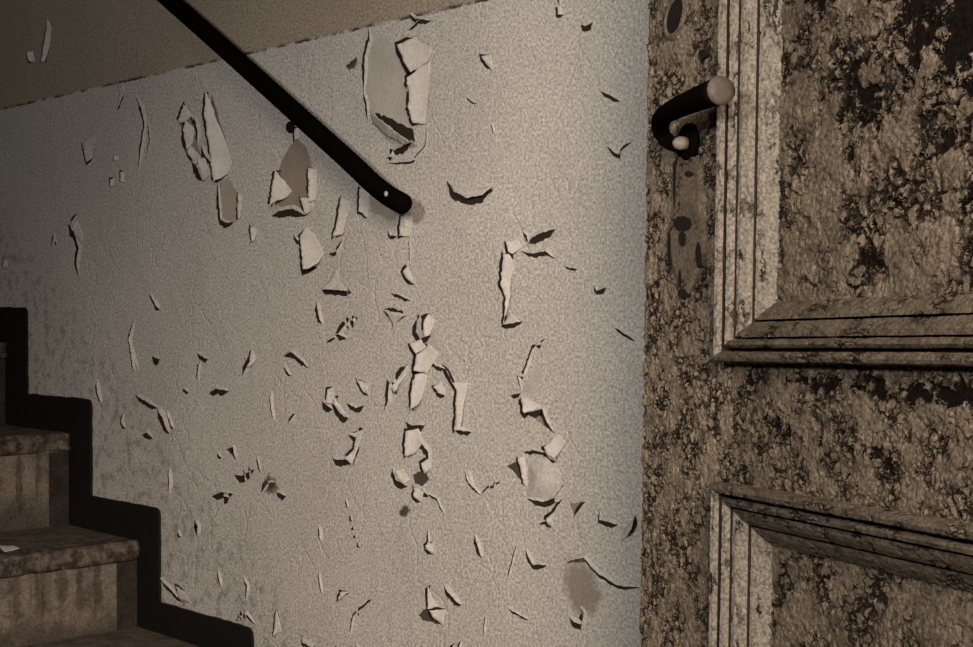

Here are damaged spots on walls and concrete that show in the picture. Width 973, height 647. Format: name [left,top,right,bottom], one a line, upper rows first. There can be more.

peeling [366,13,433,165]
peeling [176,91,257,243]
peeling [267,121,324,275]
peeling [331,186,417,288]
peeling [322,377,369,423]
peeling [332,427,364,467]
peeling [383,308,471,515]
peeling [508,338,566,488]
peeling [423,530,436,554]
peeling [539,499,586,531]
peeling [419,584,445,626]
peeling [569,606,587,630]